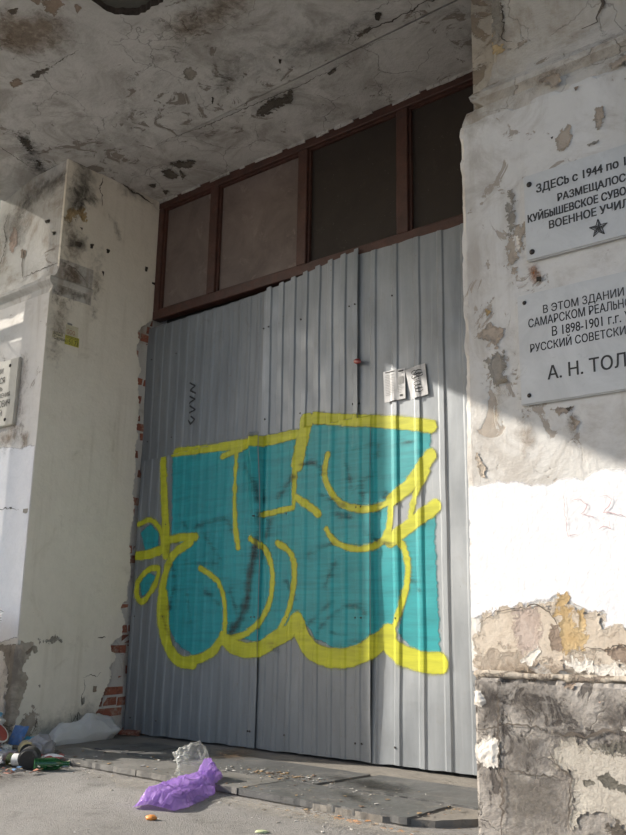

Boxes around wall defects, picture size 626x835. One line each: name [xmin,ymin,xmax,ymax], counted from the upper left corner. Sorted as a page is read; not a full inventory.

crack [582,0,605,29]
peeling [593,106,605,130]
peeling [551,124,573,151]
peeling [477,309,507,387]
flaking render [111,625,130,653]
flaking render [0,651,8,715]
flaking render [96,665,127,730]
peeling [474,690,486,707]
damp [482,686,504,721]
peeling [20,705,38,737]
peeling [475,736,500,768]
flaking render [548,726,626,835]